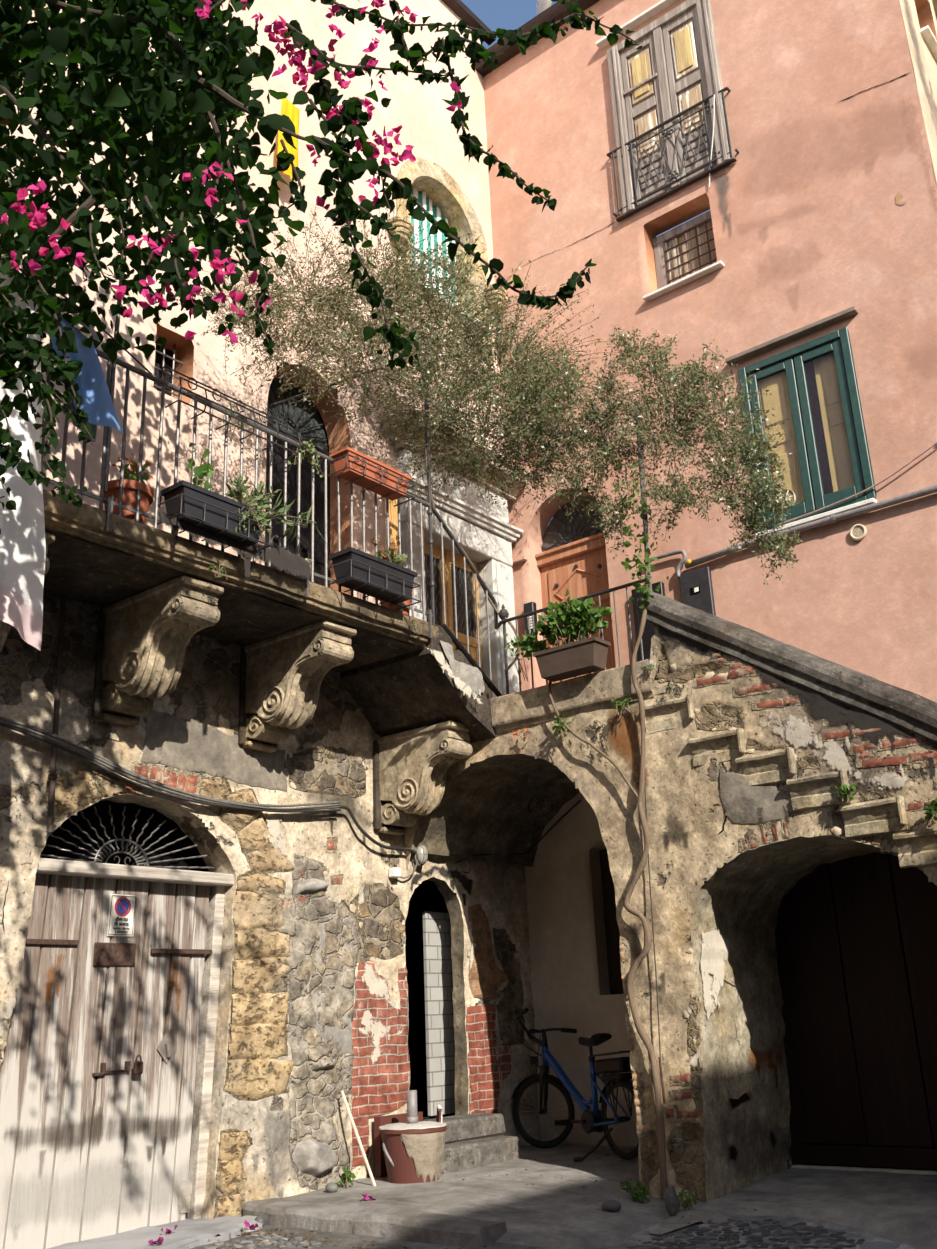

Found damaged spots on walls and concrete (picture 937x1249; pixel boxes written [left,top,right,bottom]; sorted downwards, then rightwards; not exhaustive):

crack [835,72,911,104]
leakage [905,0,937,120]
leakage [716,175,731,230]
peeling [427,648,483,704]
flaking render [653,645,937,811]
flaking render [831,810,899,855]
peeling [0,996,16,1075]
corrosion [46,968,60,1003]
flaking render [45,762,410,1190]
flaking render [466,904,525,1114]
flaking render [632,929,731,1202]
flaking render [213,1129,253,1219]